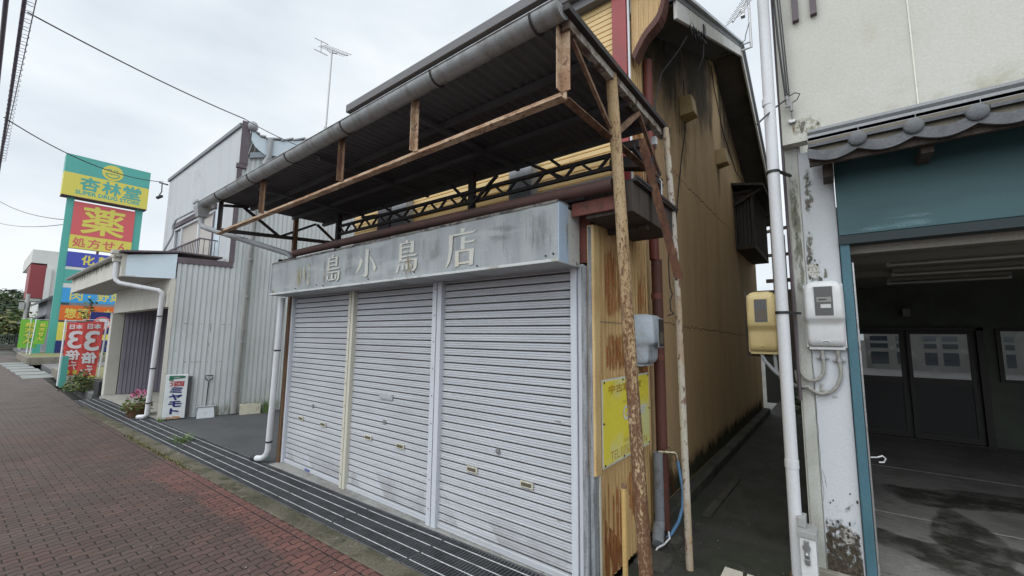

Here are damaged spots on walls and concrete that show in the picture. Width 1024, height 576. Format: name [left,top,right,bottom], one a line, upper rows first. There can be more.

spalling [807,256,823,281]
corrosion [606,336,625,369]
corrosion [605,471,635,576]
peeling [831,520,861,567]